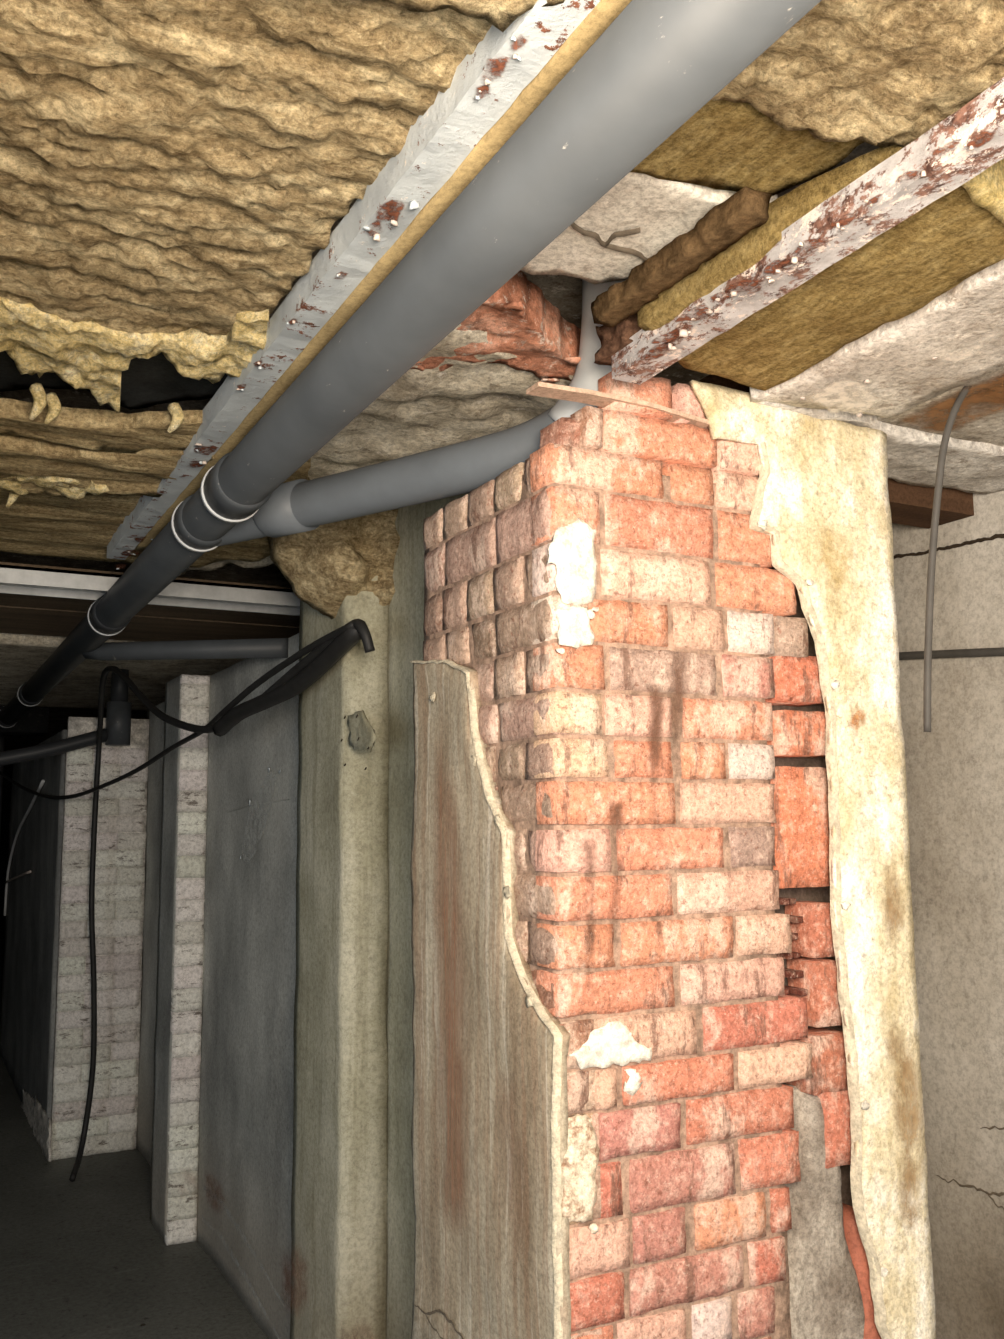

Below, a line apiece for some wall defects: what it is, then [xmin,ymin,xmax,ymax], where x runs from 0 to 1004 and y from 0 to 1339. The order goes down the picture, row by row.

corrosion [477,37,527,98]
corrosion [932,131,993,155]
corrosion [896,171,919,182]
corrosion [367,200,404,236]
corrosion [594,194,882,366]
spalling [410,270,581,384]
peeling [800,379,877,417]
spalling [540,417,580,448]
spalling [749,442,892,1339]
spalling [410,659,563,1339]
crack [936,1175,1004,1209]
crack [414,1304,464,1339]